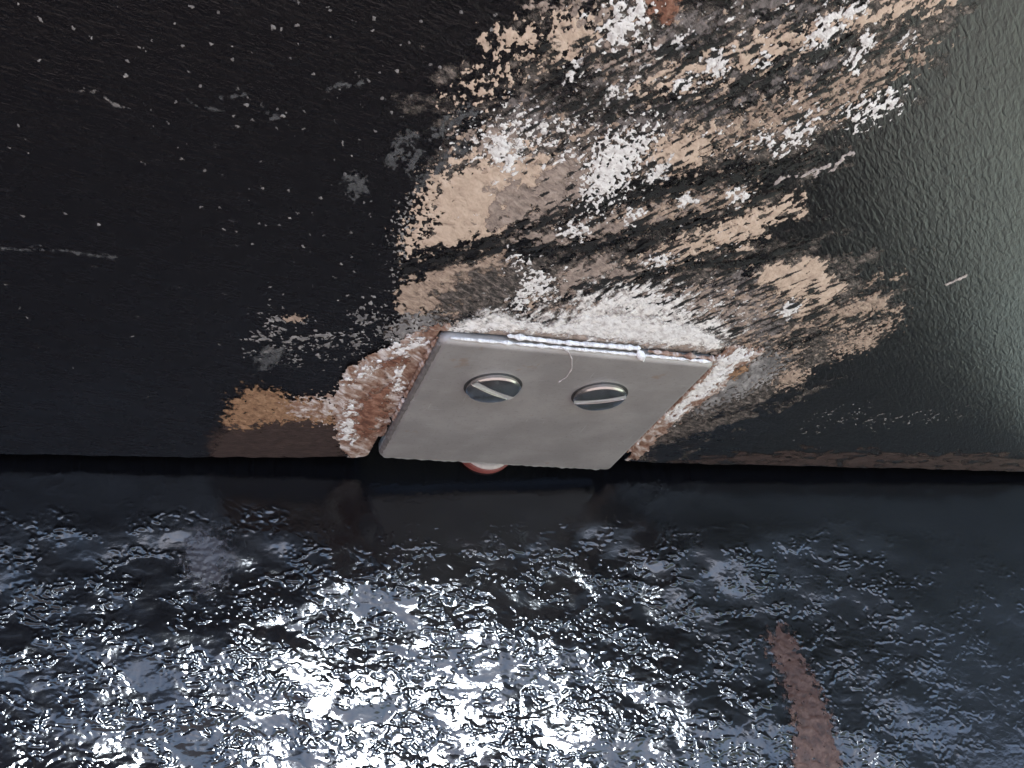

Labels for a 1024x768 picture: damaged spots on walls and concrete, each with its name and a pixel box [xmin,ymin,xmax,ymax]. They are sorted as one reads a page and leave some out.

peeling [240,0,978,463]
leakage [385,0,924,370]
corrosion [207,355,411,458]
corrosion [667,445,1024,472]
corrosion [760,621,843,768]